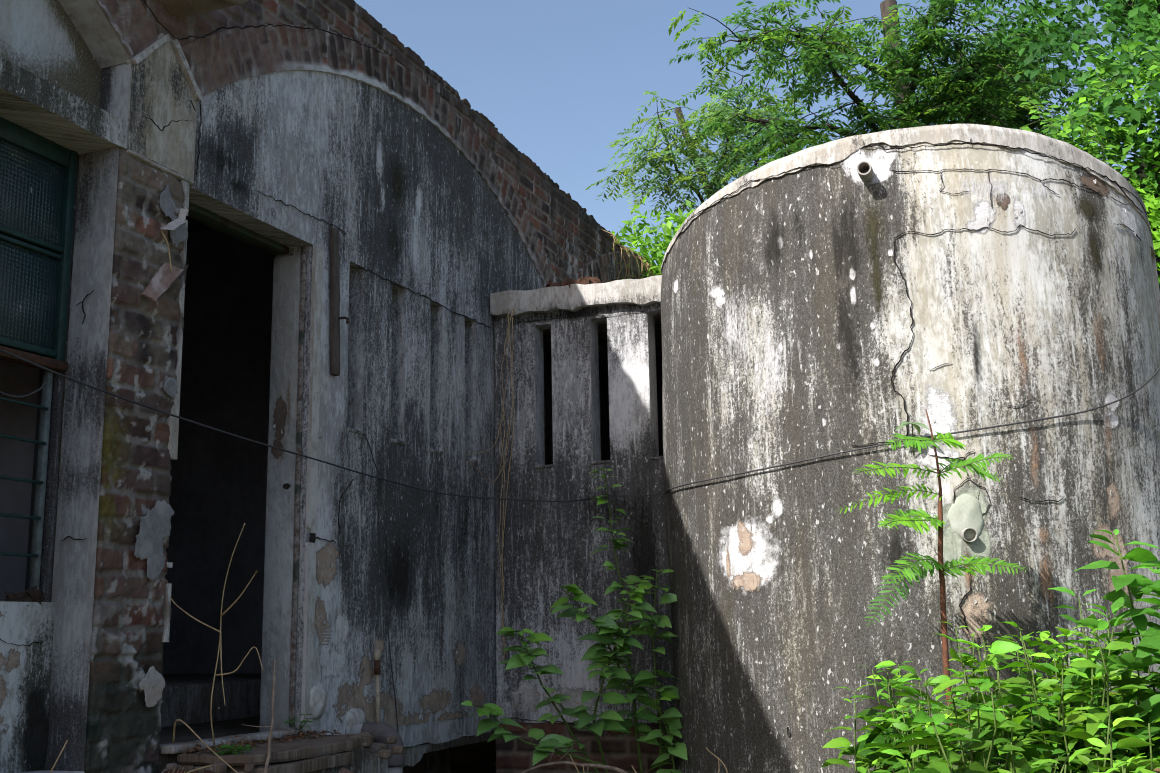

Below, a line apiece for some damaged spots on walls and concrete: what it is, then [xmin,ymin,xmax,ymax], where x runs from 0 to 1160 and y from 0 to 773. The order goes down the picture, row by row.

crack [145,100,202,175]
spalling [841,148,897,185]
damp [833,196,884,312]
damp [726,297,748,351]
damp [973,324,981,389]
crack [852,139,1147,446]
crack [932,451,990,515]
spalling [719,497,783,594]
peeling [1090,481,1131,608]
peeling [308,531,485,727]
peeling [961,593,992,641]
damp [866,655,905,728]